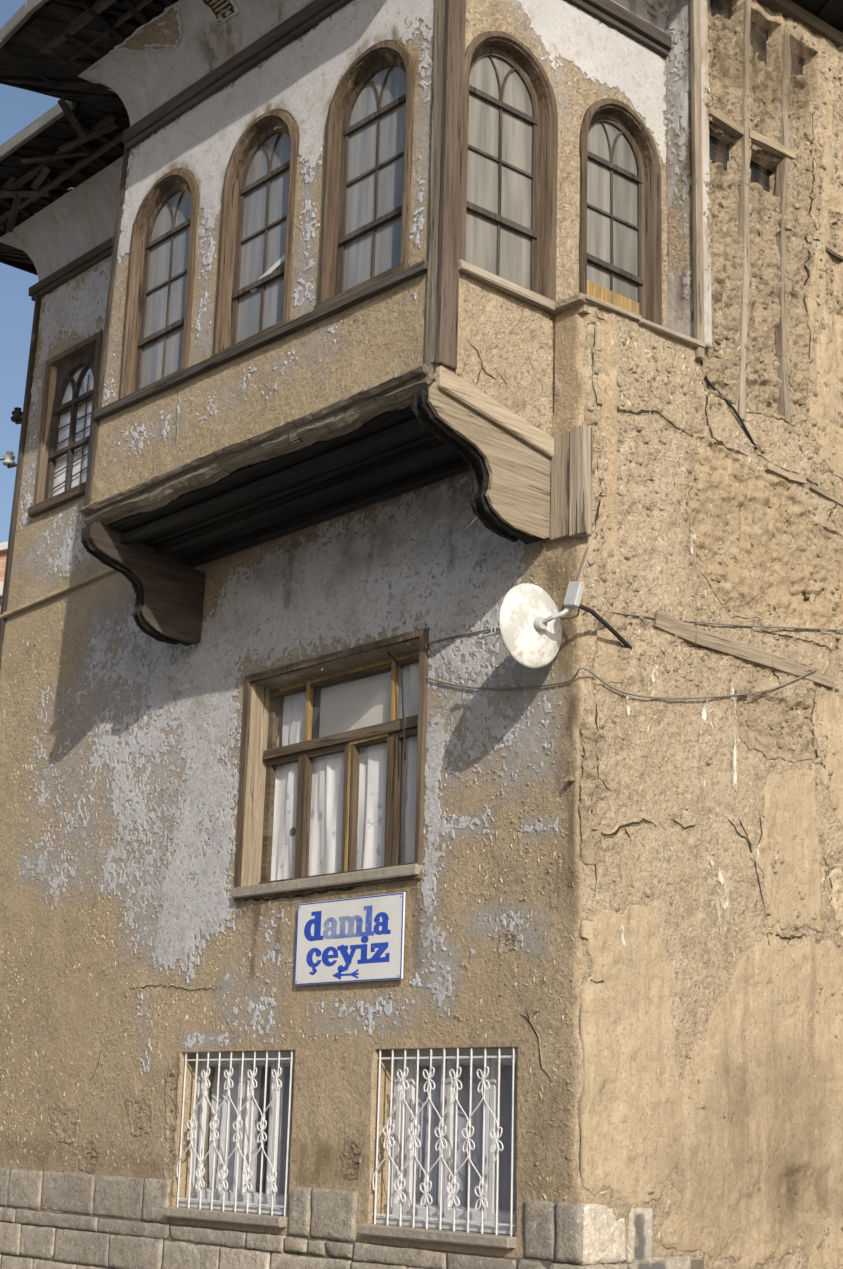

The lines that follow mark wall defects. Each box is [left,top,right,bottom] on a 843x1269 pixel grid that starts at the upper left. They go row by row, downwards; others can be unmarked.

peeling [19,0,435,530]
crack [591,327,843,566]
crack [130,984,226,993]
peeling [16,475,563,1035]
crack [519,1011,552,1083]
crack [589,702,696,898]
crack [728,817,805,971]
crack [822,856,839,903]